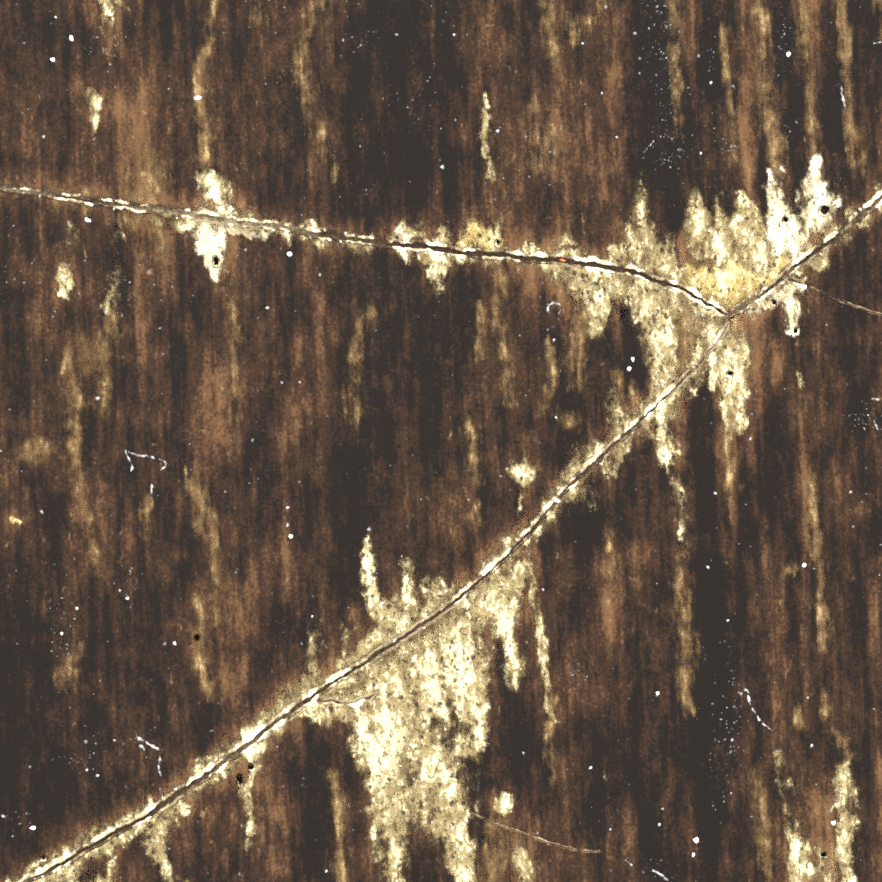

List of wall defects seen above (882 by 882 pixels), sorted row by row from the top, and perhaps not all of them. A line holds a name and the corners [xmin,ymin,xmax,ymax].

water stain [720,24,737,161]
water stain [611,371,636,416]
crack [0,184,882,882]
water stain [524,550,559,741]
water stain [329,773,347,882]